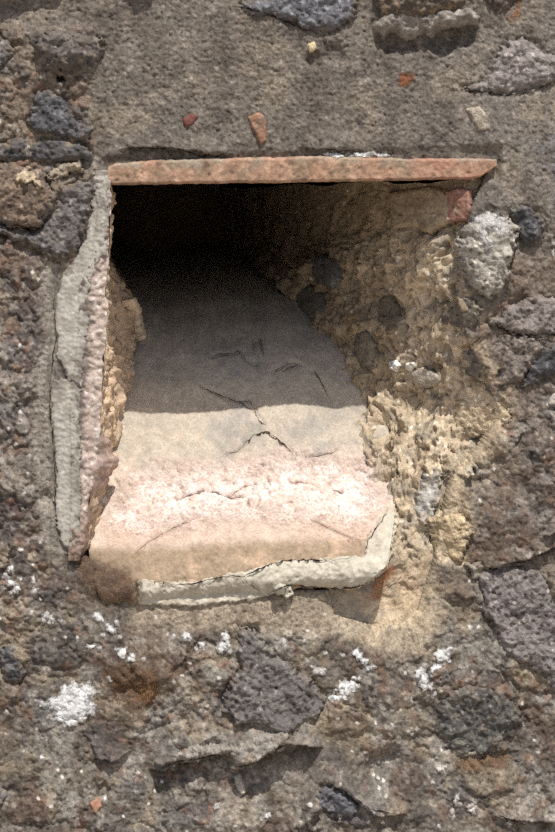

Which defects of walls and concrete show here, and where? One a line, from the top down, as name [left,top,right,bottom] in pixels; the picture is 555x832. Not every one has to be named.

peeling [51,179,112,550]
crack [213,338,327,394]
crack [200,385,294,455]
spalling [110,177,490,627]
crack [178,486,253,501]
crack [488,548,554,568]